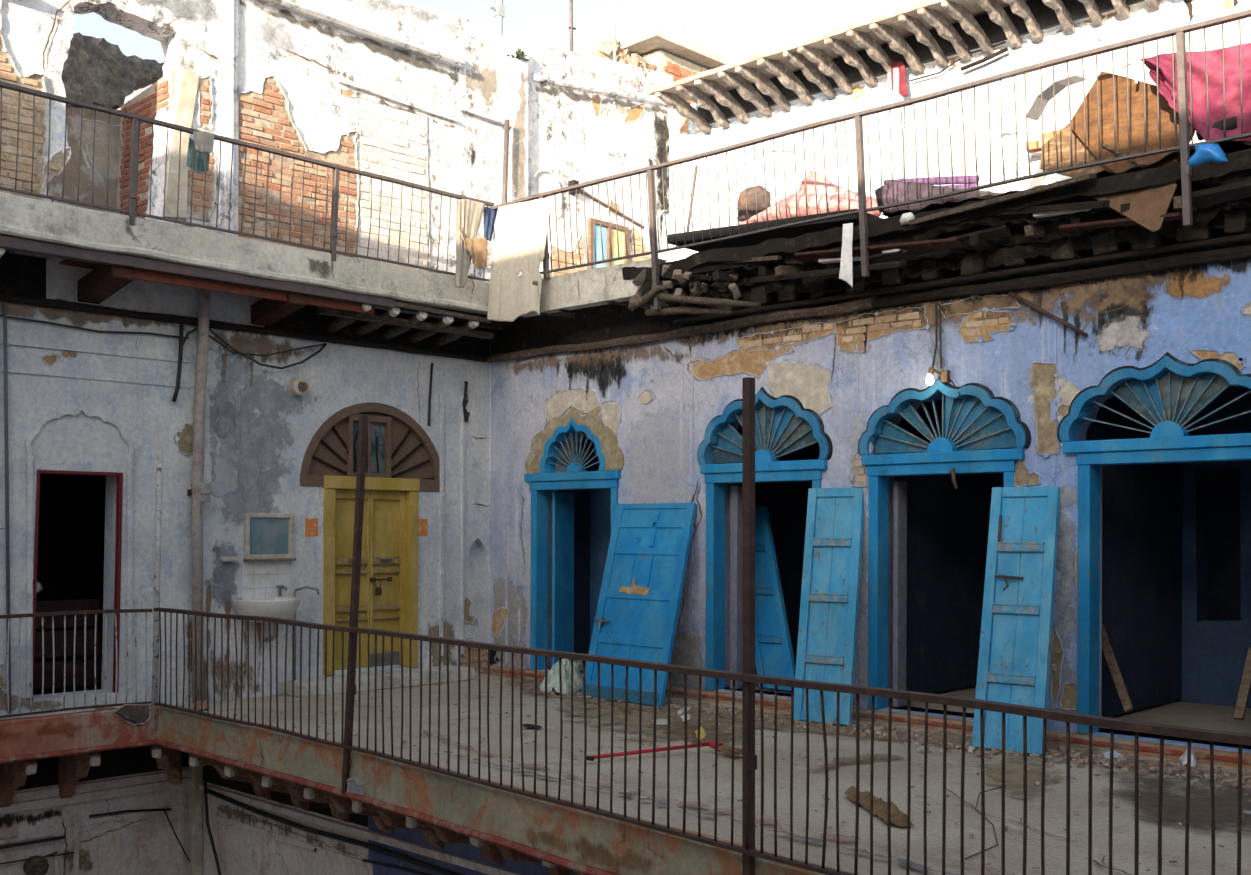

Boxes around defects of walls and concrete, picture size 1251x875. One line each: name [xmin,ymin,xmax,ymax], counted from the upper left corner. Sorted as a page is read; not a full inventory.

spalling [0,0,170,218]
spalling [238,74,428,271]
leakage [509,69,670,253]
spalling [545,386,622,437]
peeling [687,294,1020,416]
leakage [513,259,1250,409]
spalling [1014,361,1084,487]
spalling [1188,348,1248,372]
spalling [1049,545,1078,712]